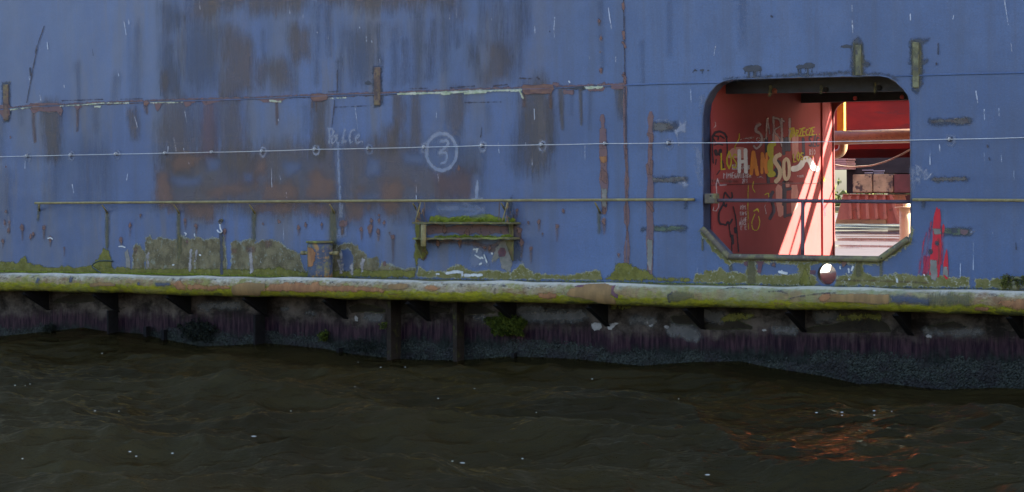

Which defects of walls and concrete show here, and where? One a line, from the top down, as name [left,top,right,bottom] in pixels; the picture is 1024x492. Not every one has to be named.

corrosion [1,66,630,272]
corrosion [646,111,654,275]
peeling [118,233,307,273]
corrosion [171,280,385,296]
peeling [333,220,417,290]